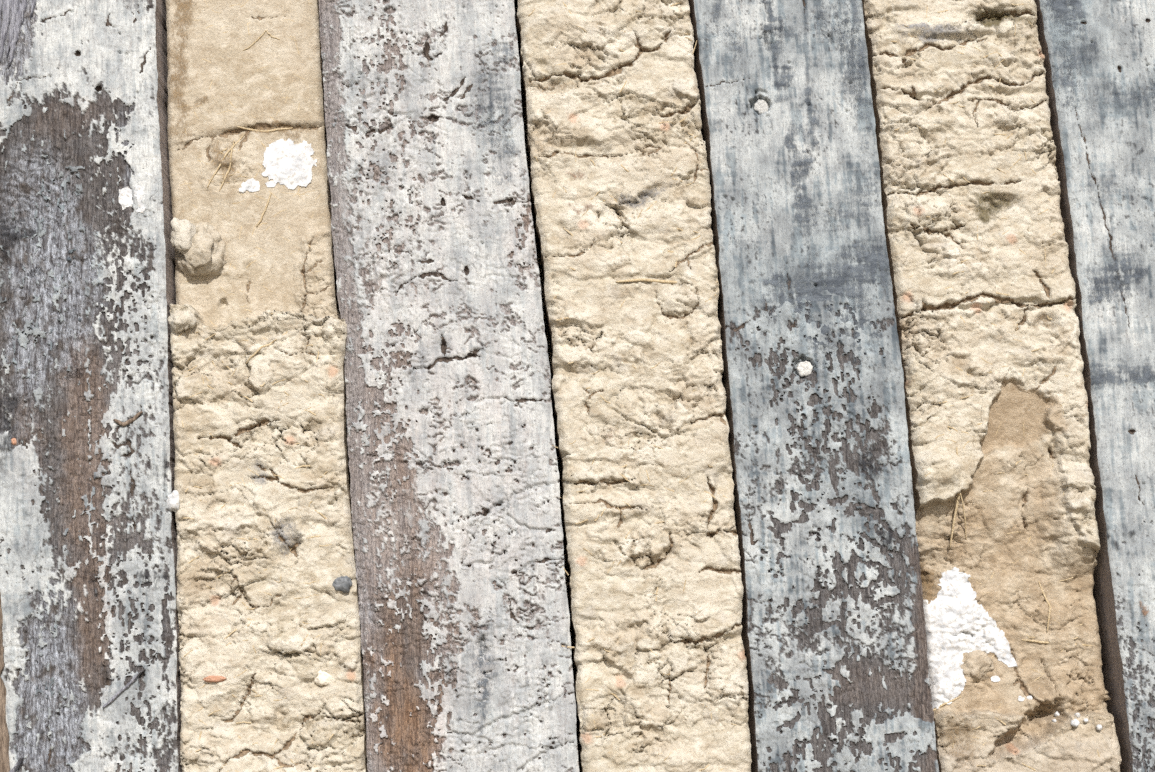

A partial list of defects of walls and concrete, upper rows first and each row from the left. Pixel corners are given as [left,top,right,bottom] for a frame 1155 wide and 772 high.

crack [533,31,671,82]
crack [872,6,1046,127]
crack [887,180,1021,196]
crack [910,224,964,249]
crack [902,271,1075,331]
spalling [0,0,573,772]
peeling [734,289,897,459]
crack [564,478,648,528]
crack [707,477,761,545]
crack [699,566,741,574]
spalling [751,367,1114,772]
crack [661,624,741,703]